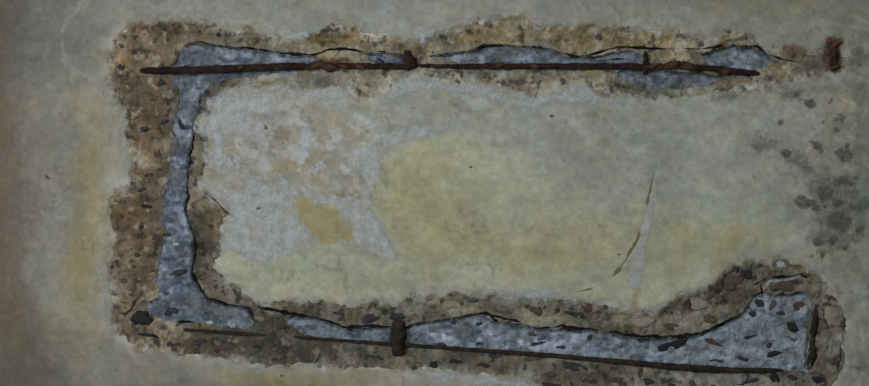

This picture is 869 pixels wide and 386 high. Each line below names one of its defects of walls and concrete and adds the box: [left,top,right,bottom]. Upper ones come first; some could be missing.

spalling [171,43,318,67]
spalling [140,61,404,75]
crack [194,20,400,63]
spalling [416,62,643,71]
spalling [431,46,643,64]
crack [430,44,798,62]
spalling [146,70,303,329]
crack [184,96,738,338]
crack [753,273,800,295]
spalling [286,316,392,342]
spalling [404,292,811,373]
crack [837,313,845,371]